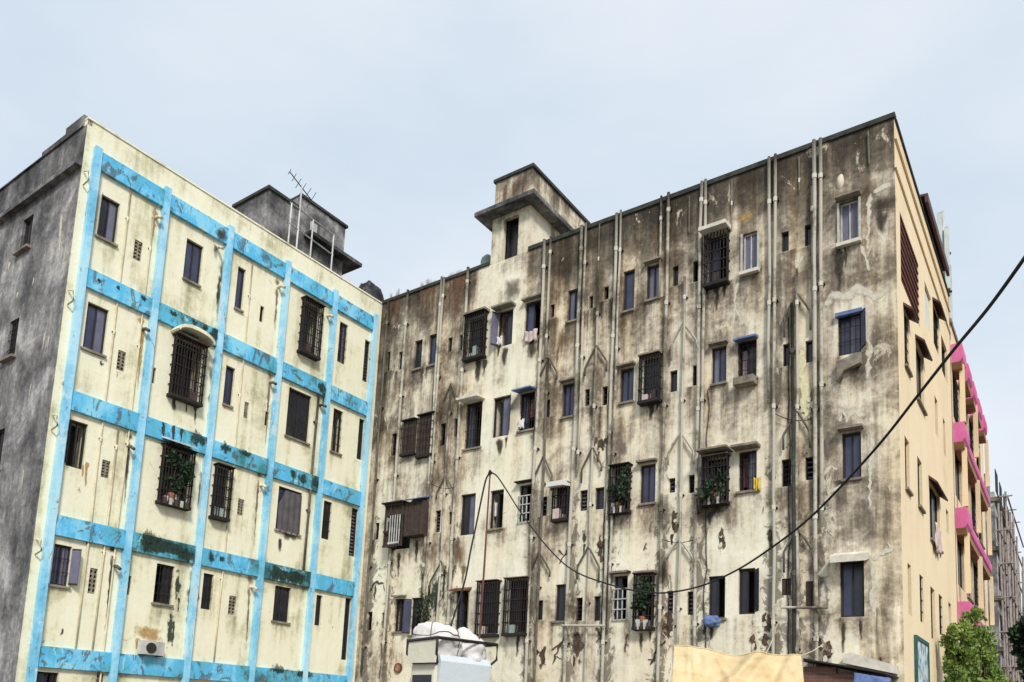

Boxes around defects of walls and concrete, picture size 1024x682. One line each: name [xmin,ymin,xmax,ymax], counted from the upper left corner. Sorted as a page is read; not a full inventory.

water stain [876,198,891,231]
water stain [824,435,833,458]
spalling [750,612,771,651]
spalling [537,646,546,669]
spalling [818,640,834,662]